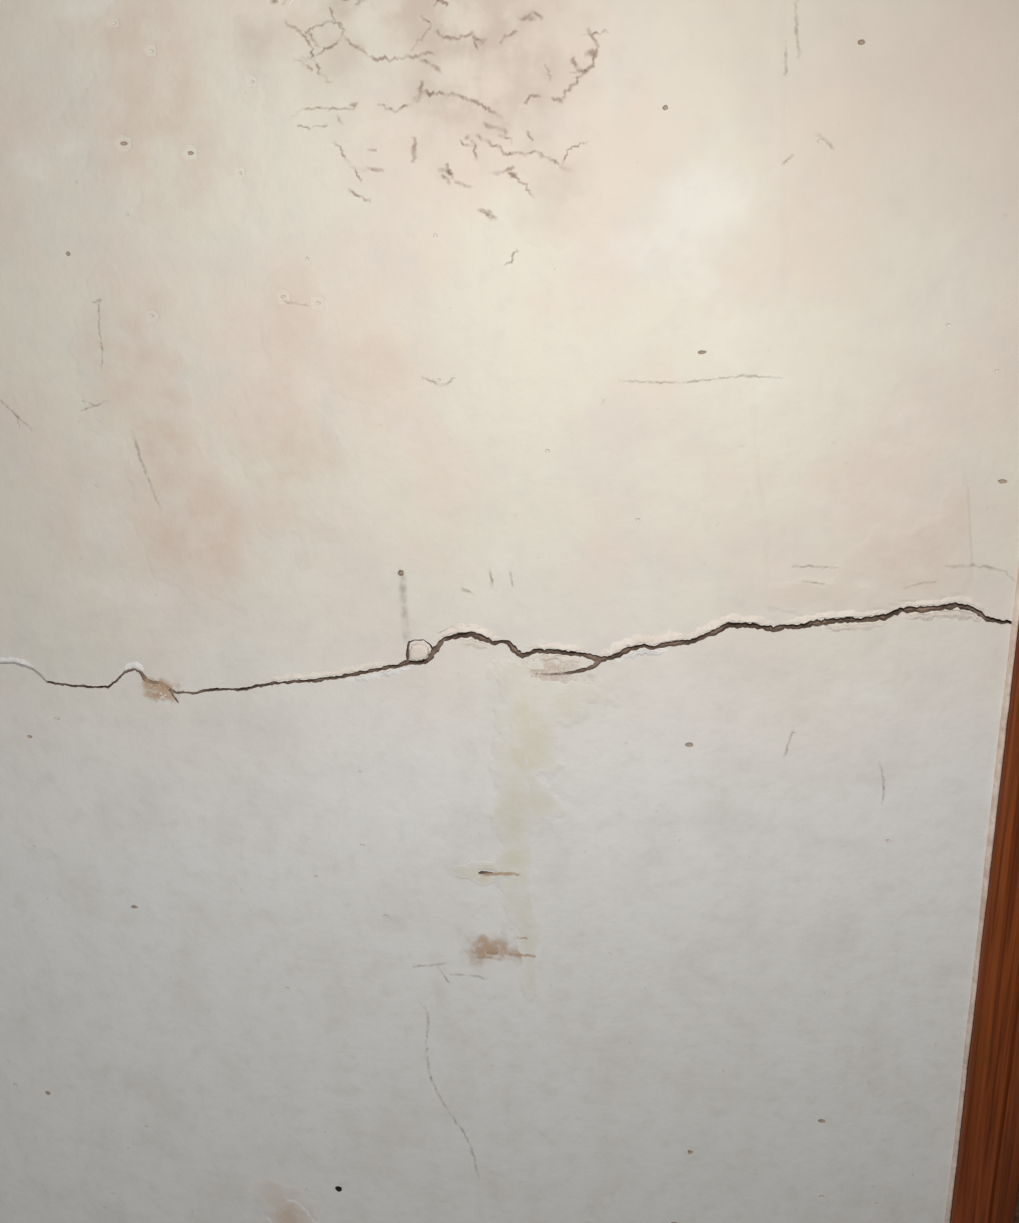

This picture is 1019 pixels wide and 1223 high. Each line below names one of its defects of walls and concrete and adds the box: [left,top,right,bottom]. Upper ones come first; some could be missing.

crack [0,596,1012,703]
rust [476,937,531,957]